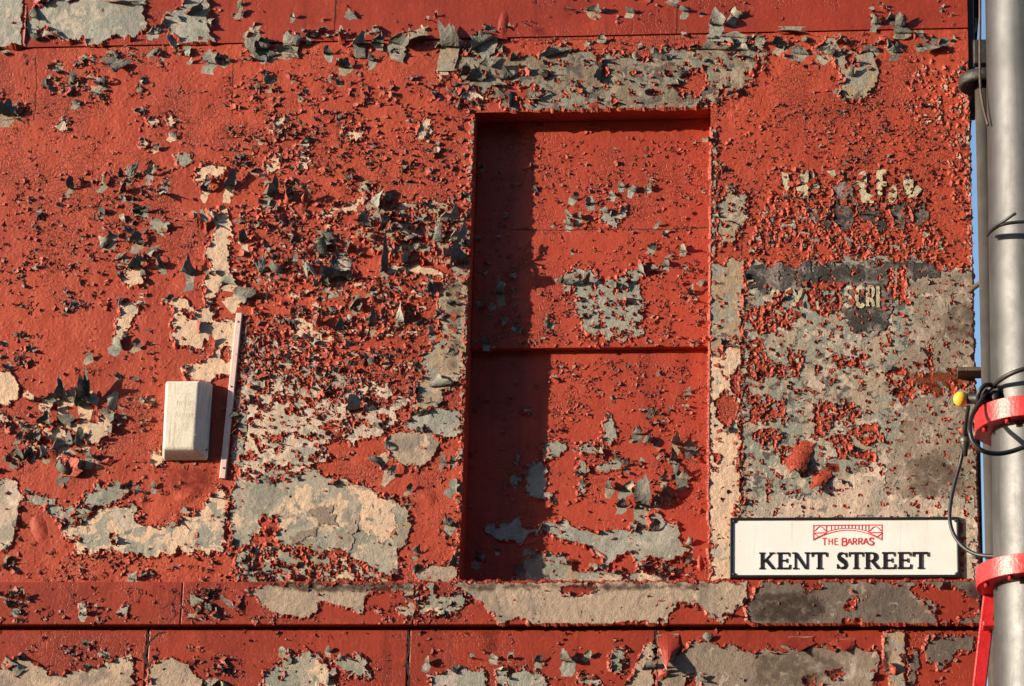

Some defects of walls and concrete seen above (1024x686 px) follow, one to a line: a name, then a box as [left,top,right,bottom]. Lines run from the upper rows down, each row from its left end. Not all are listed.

peeling [563,0,614,20]
peeling [614,0,690,25]
peeling [0,0,231,111]
peeling [28,115,73,167]
peeling [136,135,160,154]
peeling [0,173,110,318]
peeling [0,629,255,686]
peeling [253,630,378,686]
peeling [421,645,550,686]